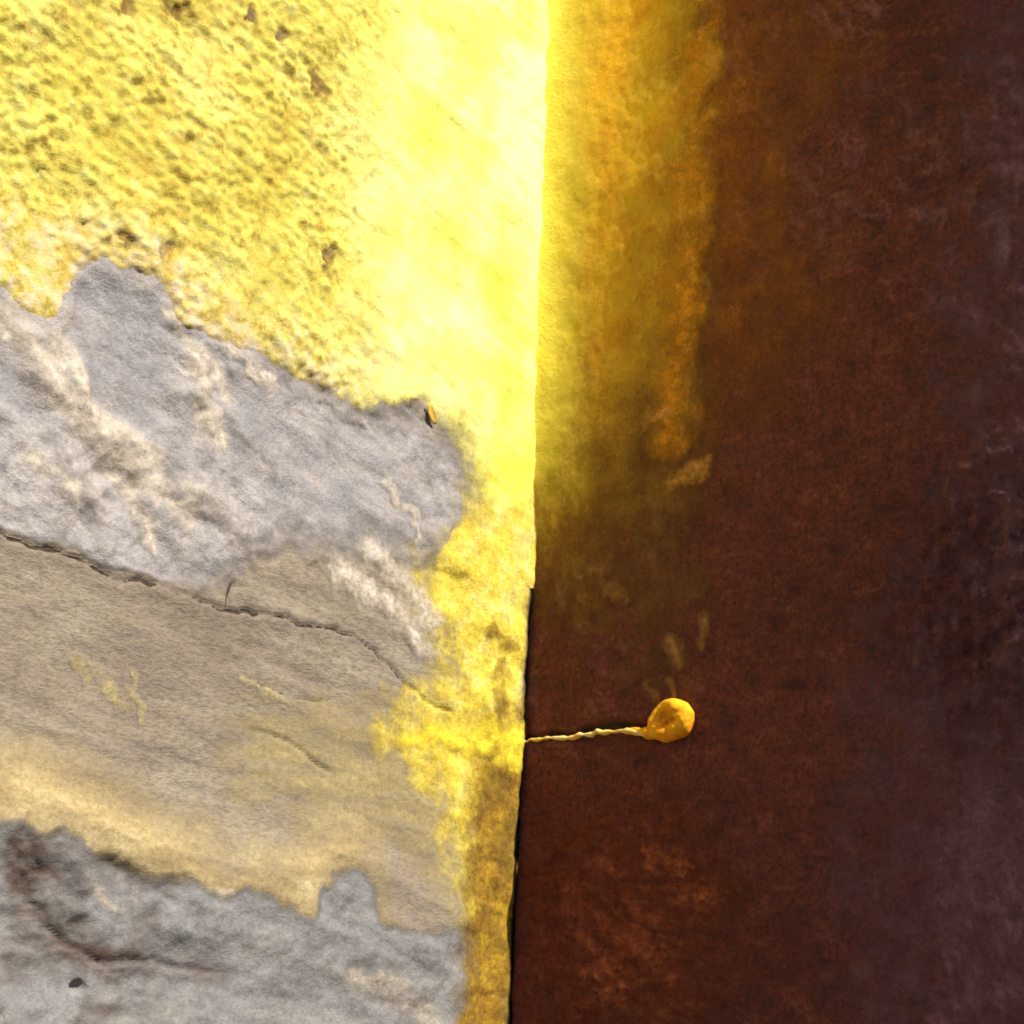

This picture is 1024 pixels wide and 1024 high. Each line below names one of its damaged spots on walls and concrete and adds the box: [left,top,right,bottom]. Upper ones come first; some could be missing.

spalling [0,257,470,653]
rust [669,458,709,487]
crack [0,530,411,690]
crack [505,586,652,1024]
rust [632,679,695,743]
peeling [0,819,480,1024]